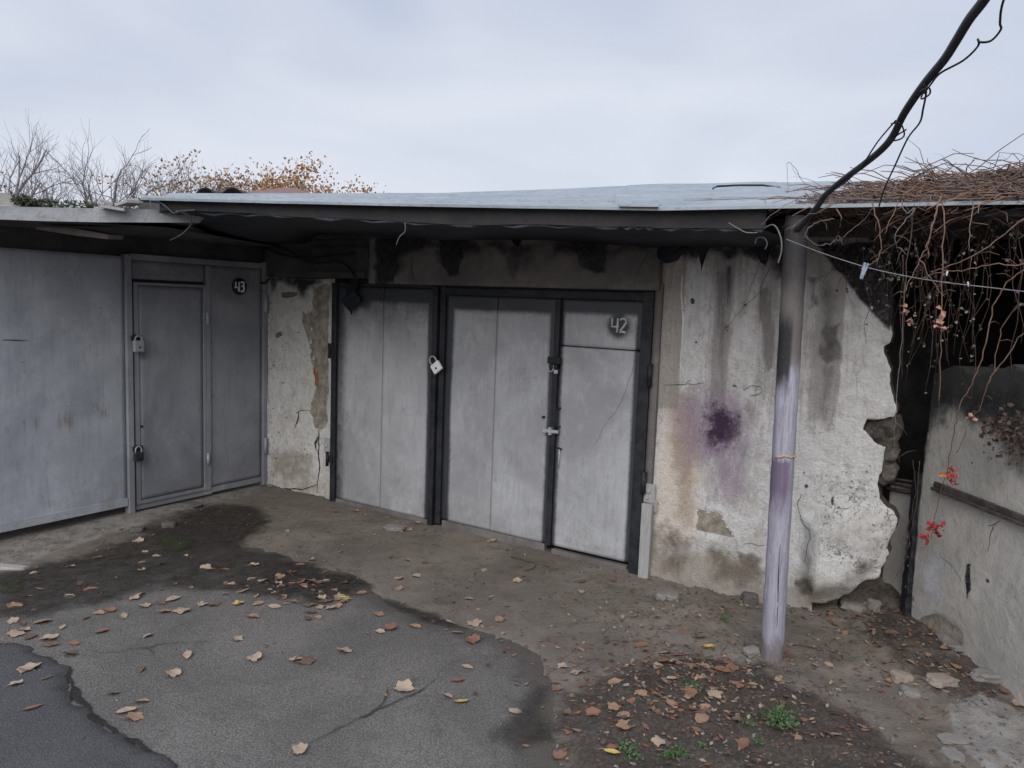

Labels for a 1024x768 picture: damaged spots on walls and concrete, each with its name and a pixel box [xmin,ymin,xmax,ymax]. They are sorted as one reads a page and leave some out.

flaking render [297,283,330,431]
leakage [759,287,774,369]
crack [268,410,320,493]
flaking render [864,413,904,487]
peeling [696,509,736,537]
leakage [714,551,760,582]